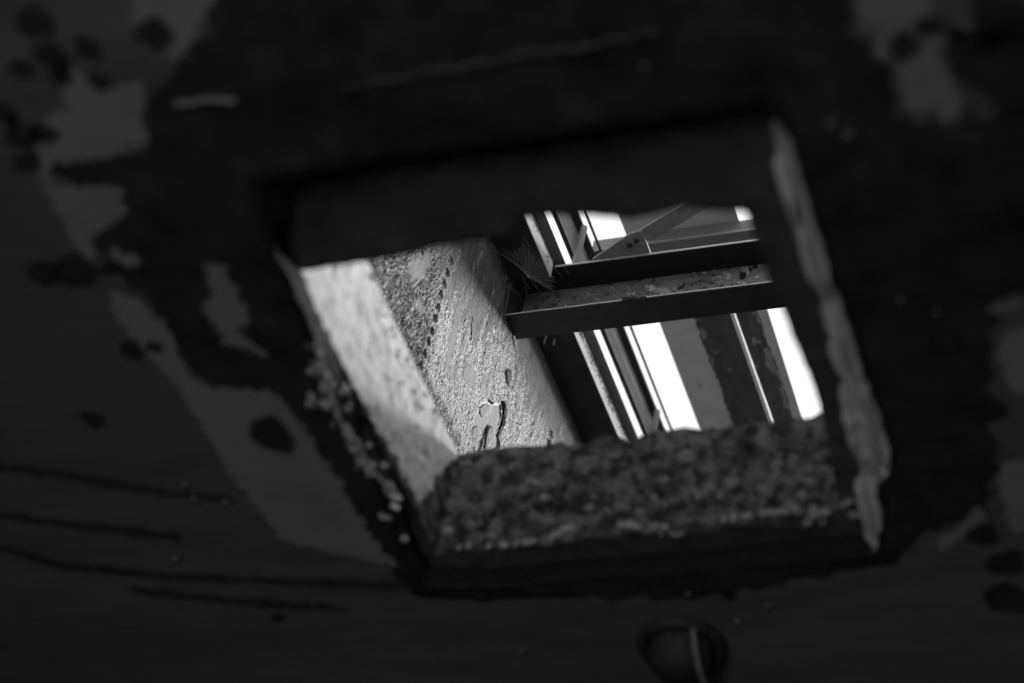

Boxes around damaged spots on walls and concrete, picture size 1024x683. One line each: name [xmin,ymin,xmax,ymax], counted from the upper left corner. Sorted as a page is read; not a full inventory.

peeling [32,63,150,281]
peeling [203,263,267,357]
peeling [110,292,402,567]
crack [474,399,501,450]